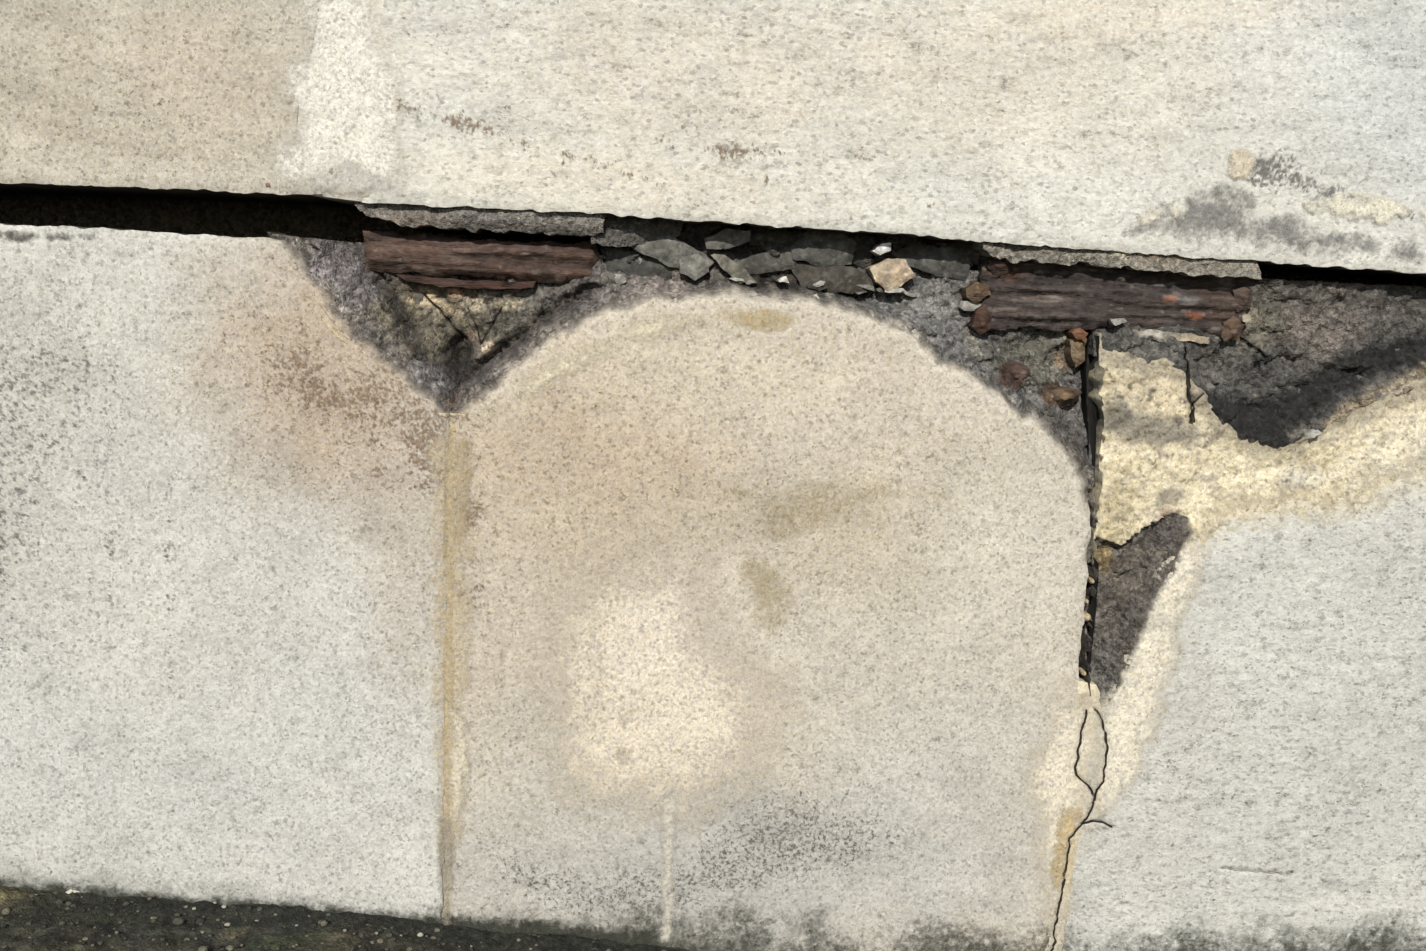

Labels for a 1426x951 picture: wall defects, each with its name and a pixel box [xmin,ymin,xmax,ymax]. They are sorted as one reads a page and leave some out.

peeling [270,228,1426,704]
crack [1051,335,1113,951]